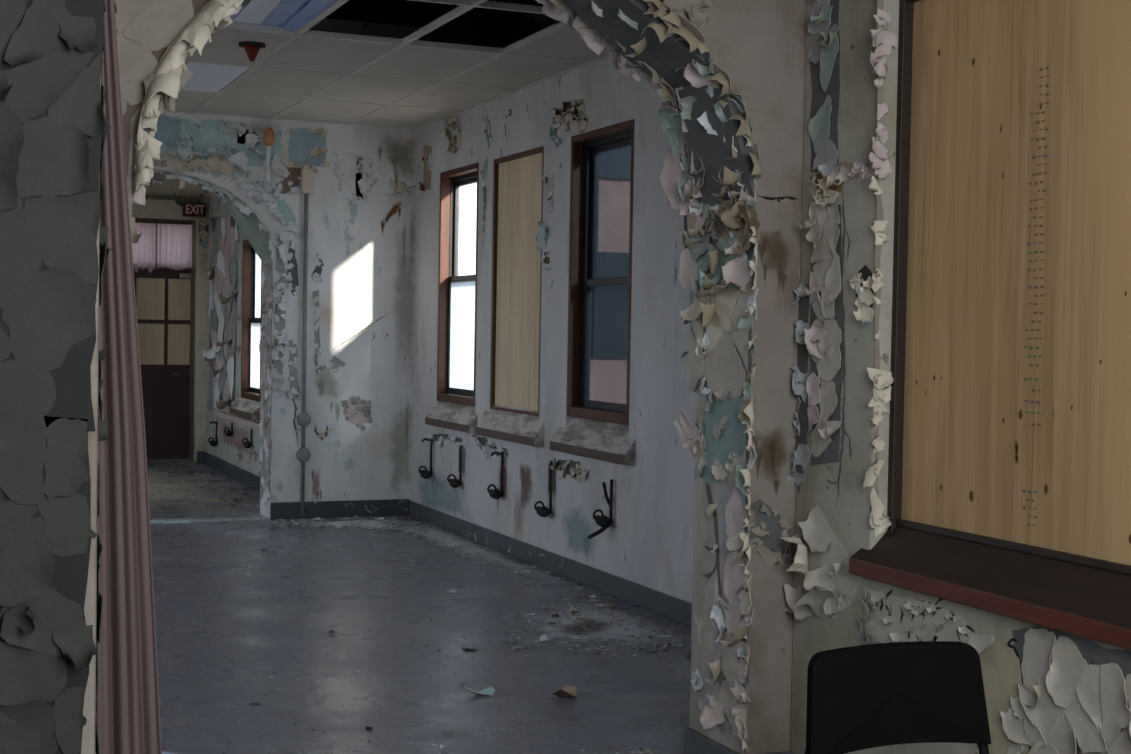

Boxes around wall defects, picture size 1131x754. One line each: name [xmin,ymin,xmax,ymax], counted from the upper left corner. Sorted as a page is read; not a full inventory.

peeling [440,114,463,154]
peeling [535,0,1131,754]
peeling [427,433,508,462]